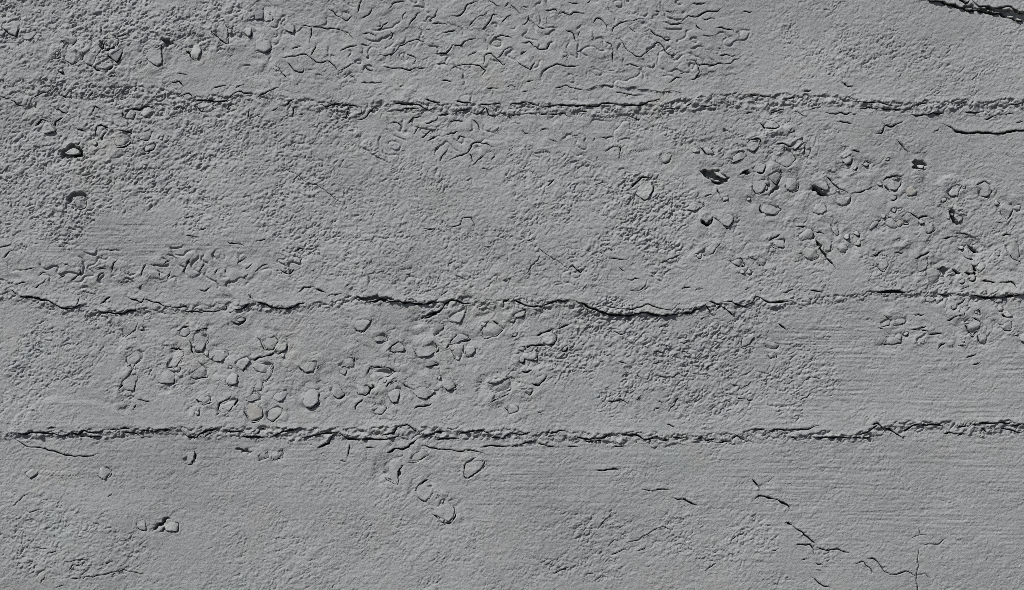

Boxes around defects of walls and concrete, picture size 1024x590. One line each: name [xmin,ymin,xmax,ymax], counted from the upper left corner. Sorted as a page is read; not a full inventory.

crack [0,90,93,107]
crack [170,0,1024,308]
crack [0,216,823,403]
crack [8,421,1024,497]
crack [32,547,143,588]
crack [752,479,945,590]